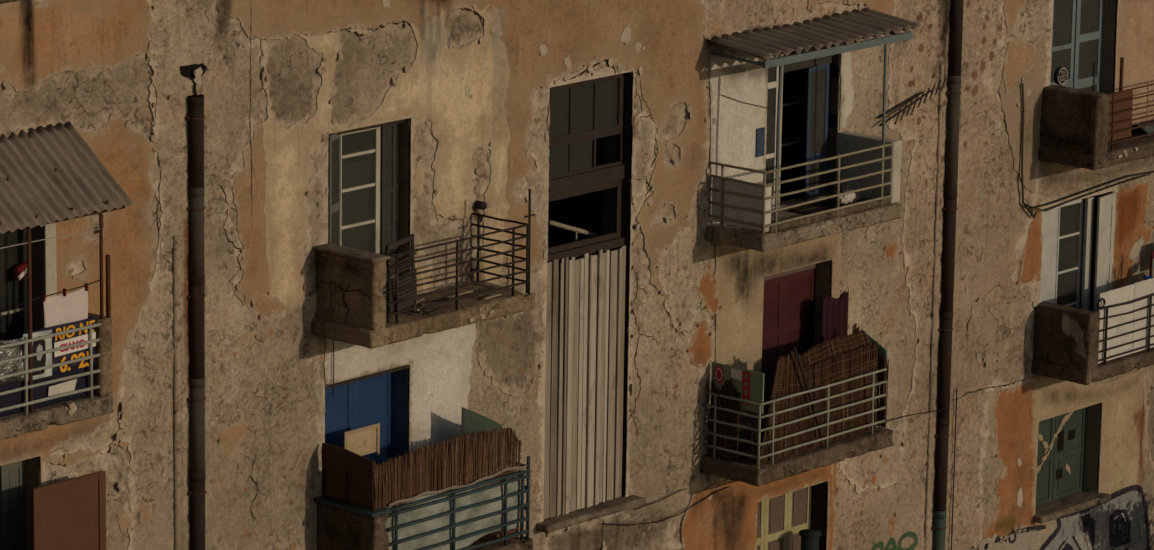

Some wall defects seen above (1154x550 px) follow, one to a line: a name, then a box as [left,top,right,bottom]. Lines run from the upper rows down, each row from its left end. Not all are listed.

spalling [0,0,417,550]
spalling [514,24,722,550]
spalling [701,0,868,50]
spalling [824,0,1043,550]
peeling [1062,315,1086,359]
peeling [1112,182,1154,290]